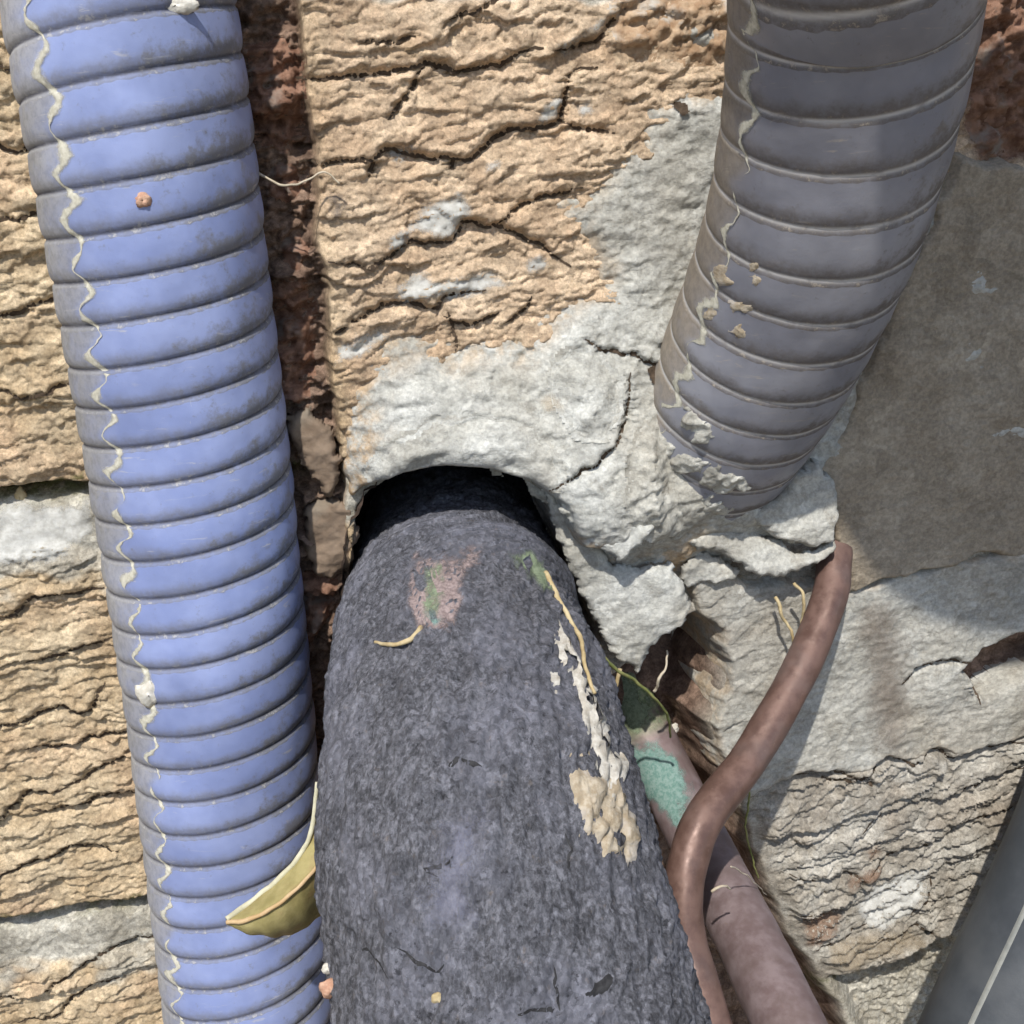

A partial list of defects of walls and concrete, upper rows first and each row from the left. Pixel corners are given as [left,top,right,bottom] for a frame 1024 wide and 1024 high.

crack [449,0,499,20]
crack [295,17,616,177]
crack [328,187,583,273]
crack [324,290,532,352]
crack [549,339,656,492]
peeling [541,458,839,674]
crack [901,658,981,705]
crack [797,748,955,787]
crack [987,741,1024,771]
crack [789,844,928,882]
crack [816,878,934,951]